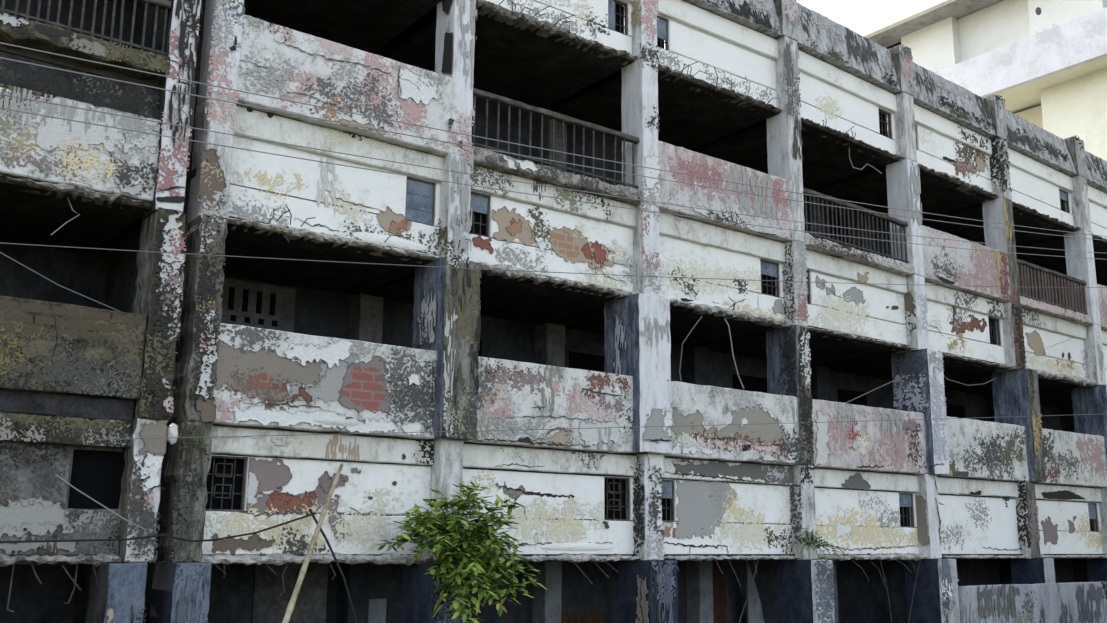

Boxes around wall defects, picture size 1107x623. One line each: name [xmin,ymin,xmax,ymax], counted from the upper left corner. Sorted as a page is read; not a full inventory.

damp [507,0,610,44]
damp [0,419,133,506]
damp [0,0,560,467]
flaking render [194,316,393,424]
spalling [175,456,435,596]
spalling [0,71,640,299]
damp [462,468,610,553]
flaking render [495,404,800,623]
spalling [660,293,915,387]
damp [572,0,1107,560]
peeling [824,315,1107,489]
damp [939,496,1045,623]